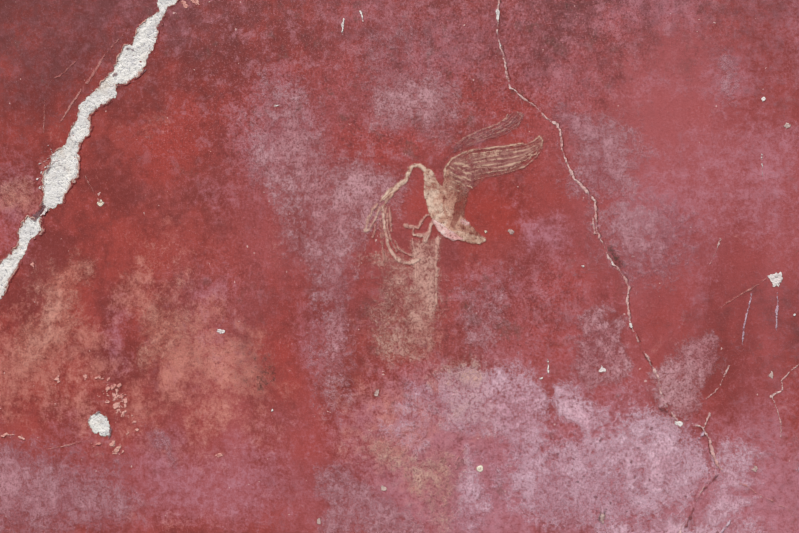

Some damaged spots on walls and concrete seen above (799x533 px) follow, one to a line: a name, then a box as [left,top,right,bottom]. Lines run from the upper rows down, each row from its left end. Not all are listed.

crack [31,205,48,221]
crack [496,0,723,533]
spalling [768,272,783,287]
spalling [83,374,139,455]